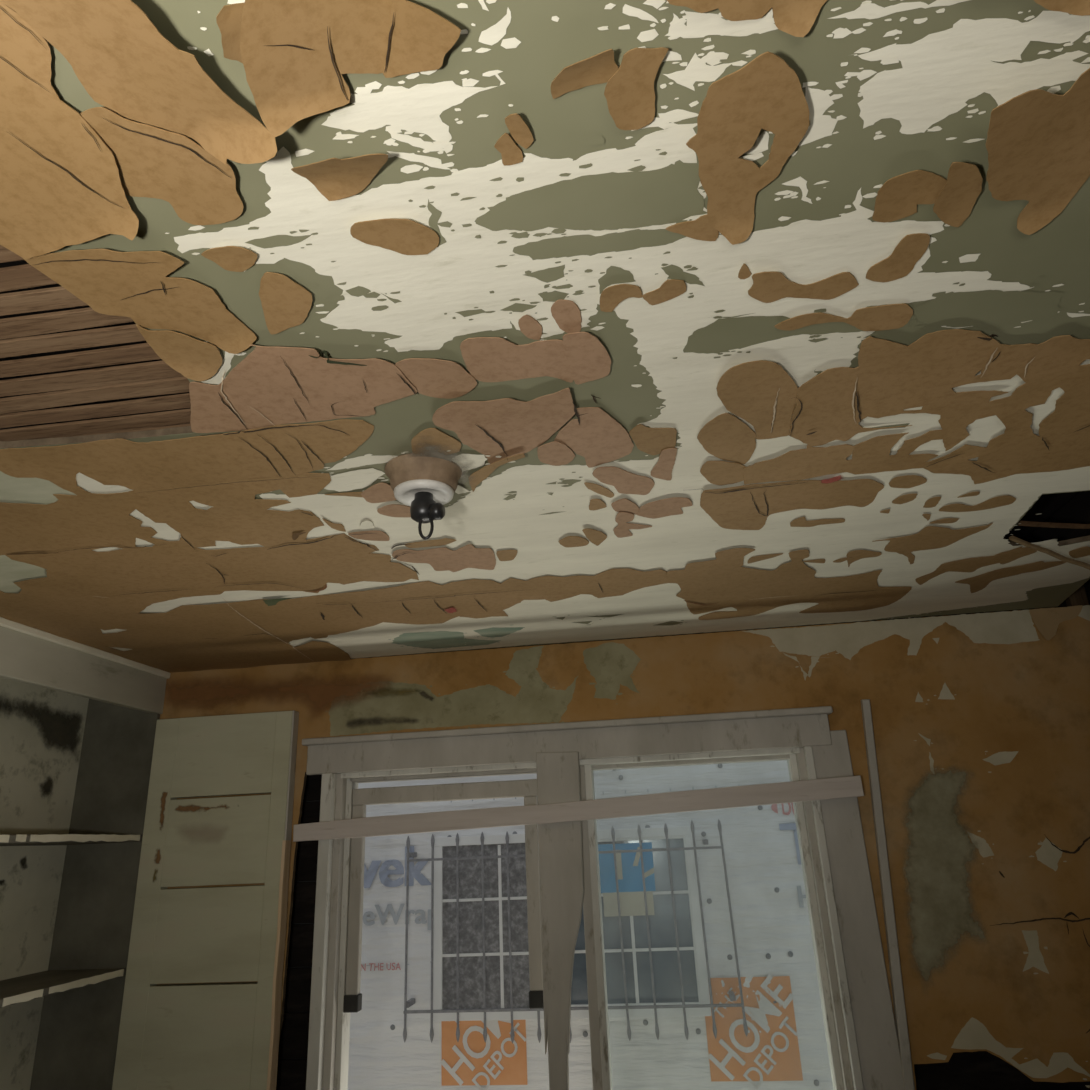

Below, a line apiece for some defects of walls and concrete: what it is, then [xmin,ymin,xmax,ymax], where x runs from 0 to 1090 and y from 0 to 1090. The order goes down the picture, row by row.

flaking render [0,0,1090,736]
crack [139,351,372,493]
crack [476,425,507,455]
crack [573,395,601,424]
crack [771,392,817,435]
crack [852,380,861,422]
water stain [0,700,81,752]
flaking render [983,751,1018,773]
flaking render [1028,838,1067,871]
crack [990,912,1090,947]
flaking render [1022,930,1049,974]
flaking render [927,1017,1090,1088]